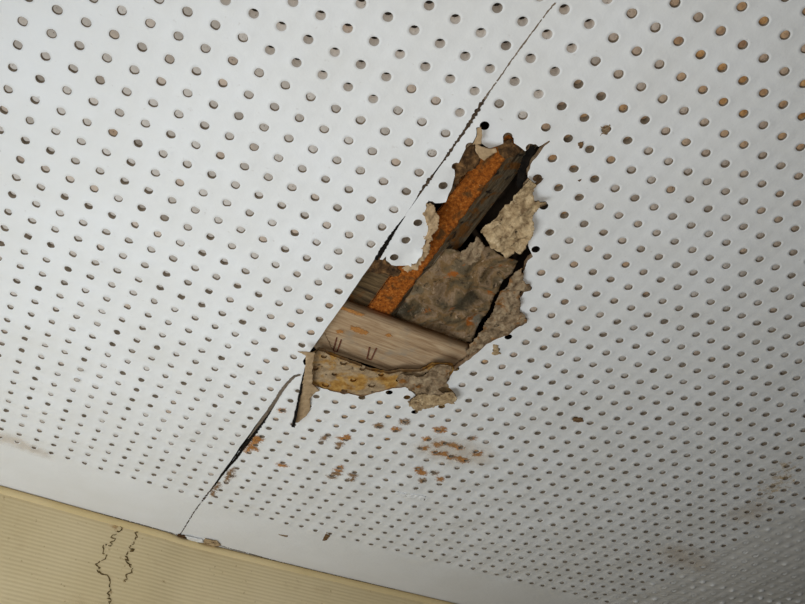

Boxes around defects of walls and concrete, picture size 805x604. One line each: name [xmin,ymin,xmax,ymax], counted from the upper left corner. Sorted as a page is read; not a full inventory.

crack [417,3,556,197]
crack [375,216,405,260]
spalling [291,127,550,427]
crack [92,374,300,604]
corrosion [244,435,264,452]
corrosion [421,426,483,464]